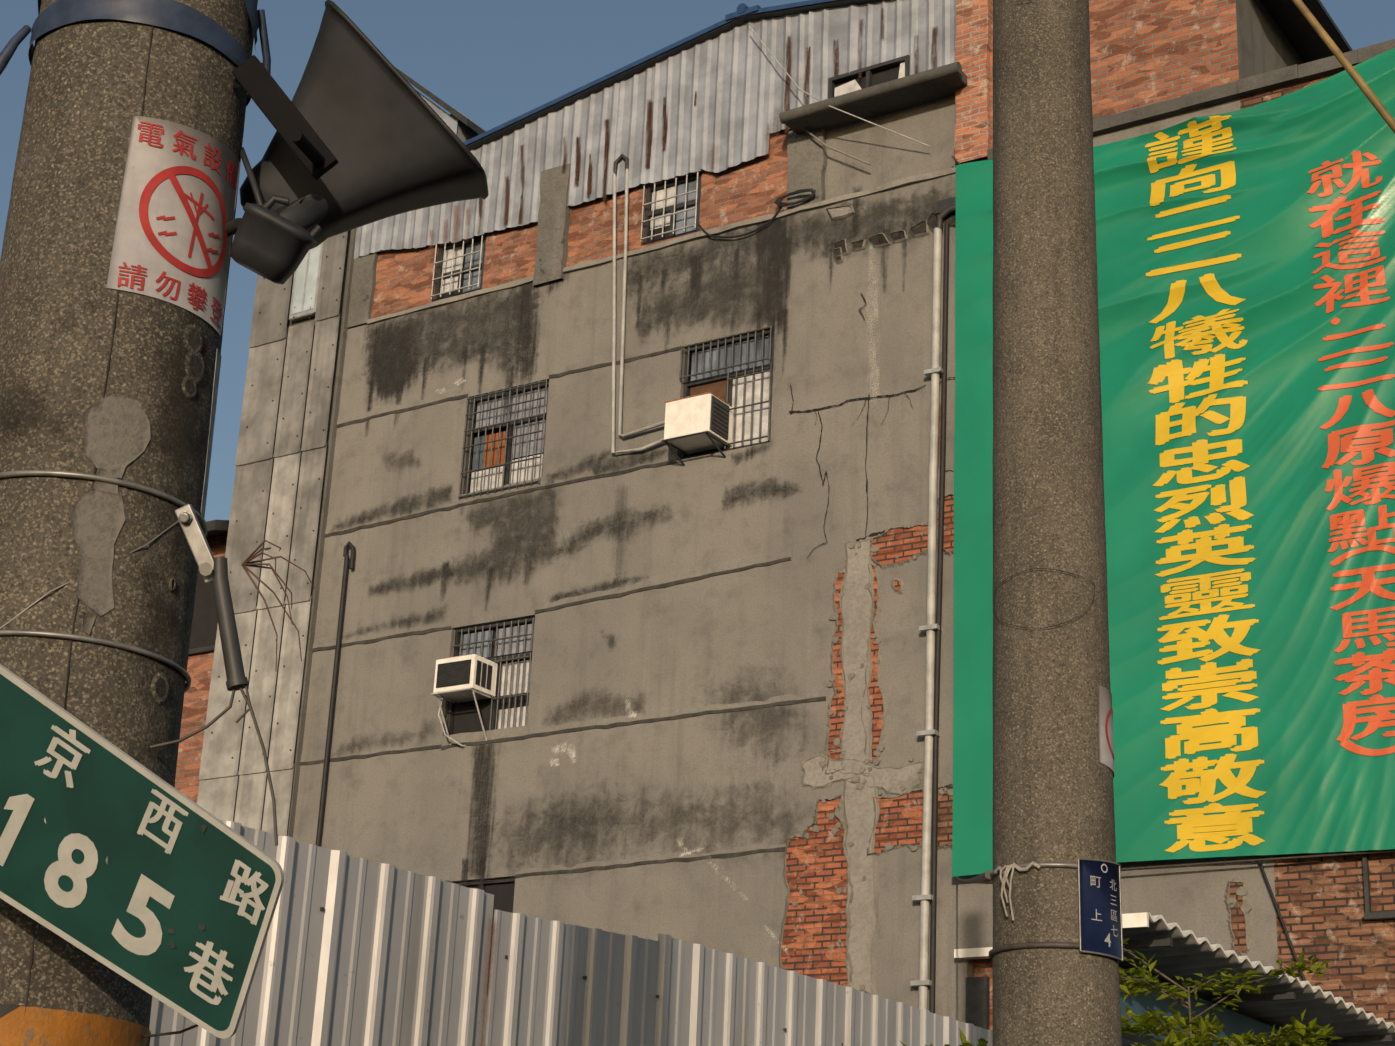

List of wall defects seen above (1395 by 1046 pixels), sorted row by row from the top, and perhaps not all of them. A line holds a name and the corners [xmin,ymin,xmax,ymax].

rust [504,145,524,225]
rust [562,119,609,201]
rust [645,97,667,167]
rust [784,36,810,135]
rust [915,27,937,74]
water stain [627,188,950,360]
water stain [366,284,536,426]
crack [789,377,955,558]
water stain [371,450,664,601]
water stain [391,611,442,626]
peeling [778,492,954,995]